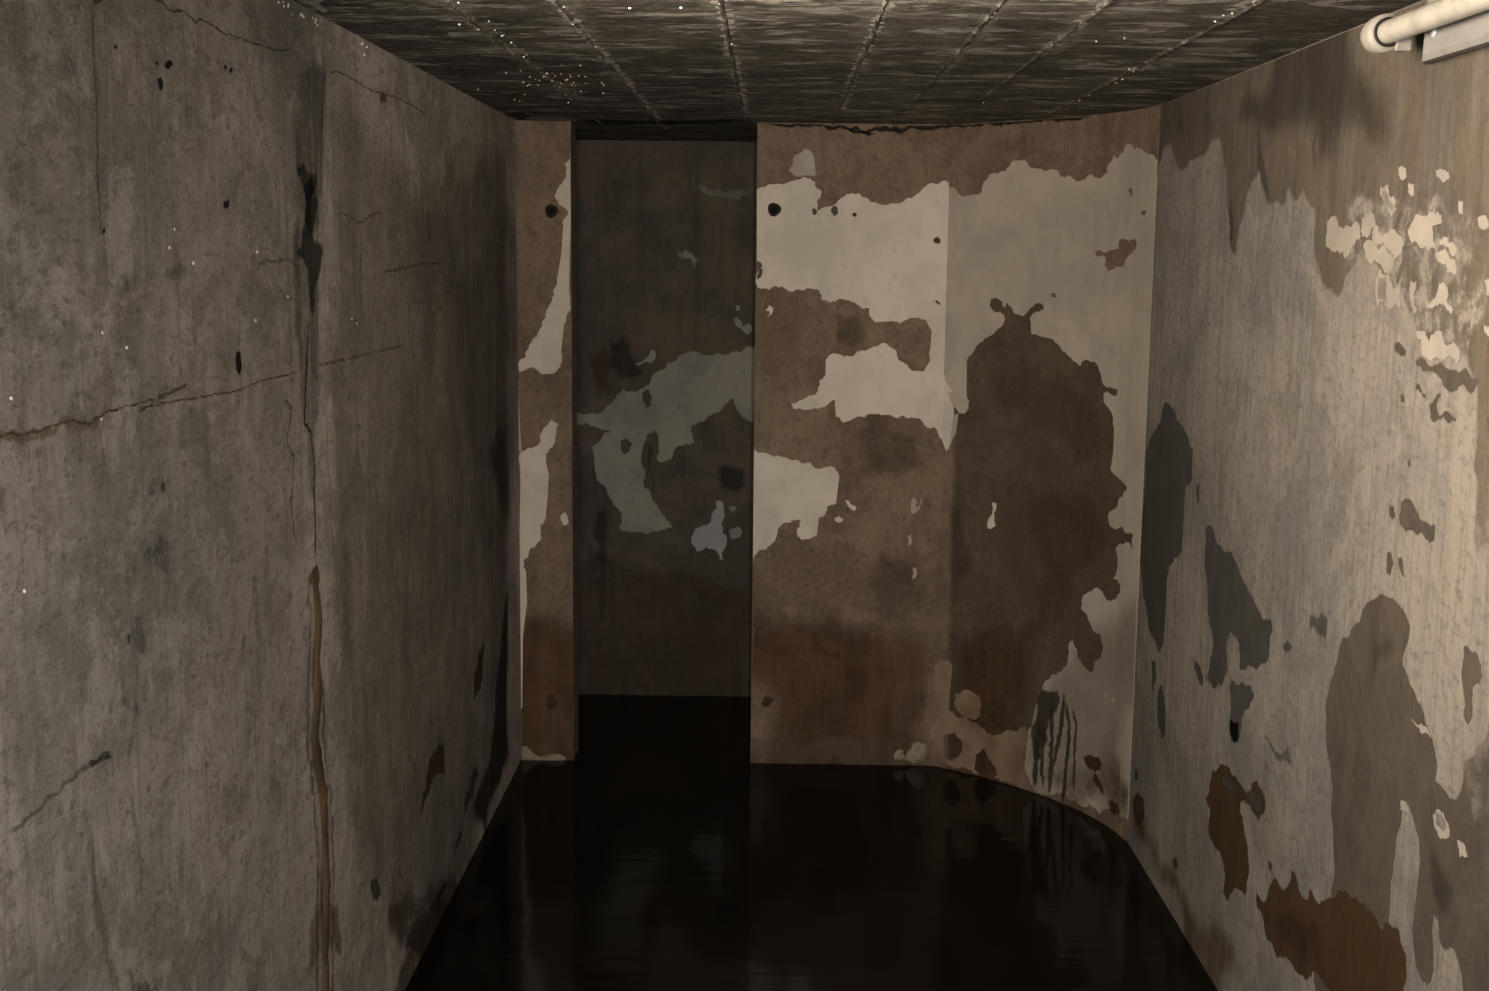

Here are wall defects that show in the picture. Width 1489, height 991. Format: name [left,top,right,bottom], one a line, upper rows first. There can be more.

crack [0,345,402,443]
water stain [259,51,324,554]
peeling [518,396,569,708]
peeling [518,155,571,375]
peeling [577,305,755,534]
peeling [691,450,856,560]
peeling [756,144,1158,820]
peeling [1326,166,1489,364]
rust [307,565,341,991]
water stain [1031,690,1077,802]
rust [1206,764,1406,991]
peeling [1433,809,1467,858]